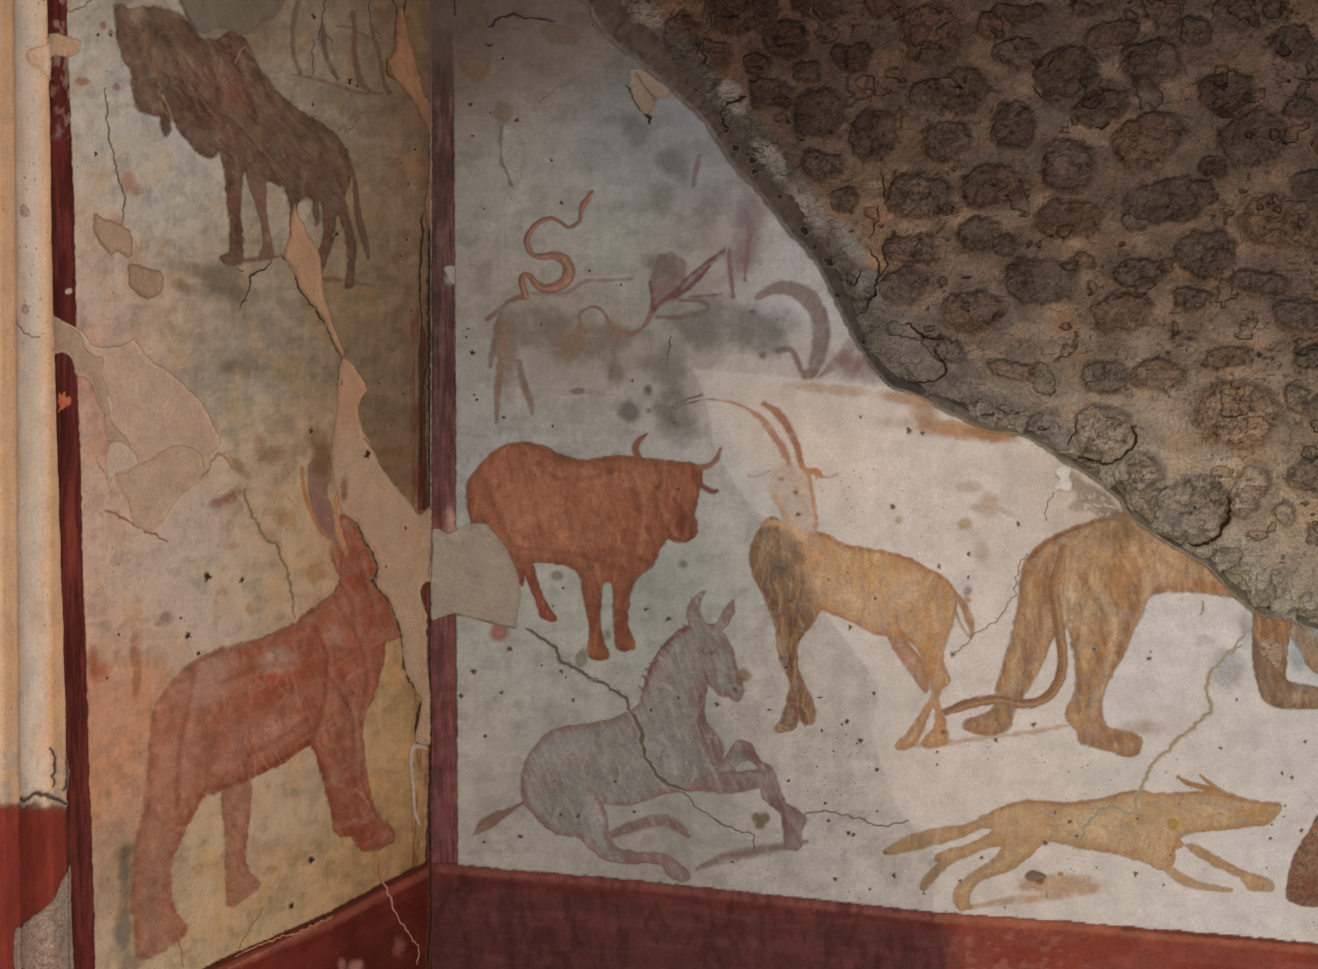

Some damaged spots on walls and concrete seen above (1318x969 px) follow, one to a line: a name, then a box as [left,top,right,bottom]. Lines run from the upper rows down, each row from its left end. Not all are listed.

spalling [93,214,163,299]
spalling [579,0,1318,632]
peeling [54,317,221,532]
spalling [284,204,431,827]
crack [356,522,432,969]
crack [525,628,755,852]
crack [802,810,909,827]
crack [1079,632,1247,842]
spalling [1259,639,1283,668]